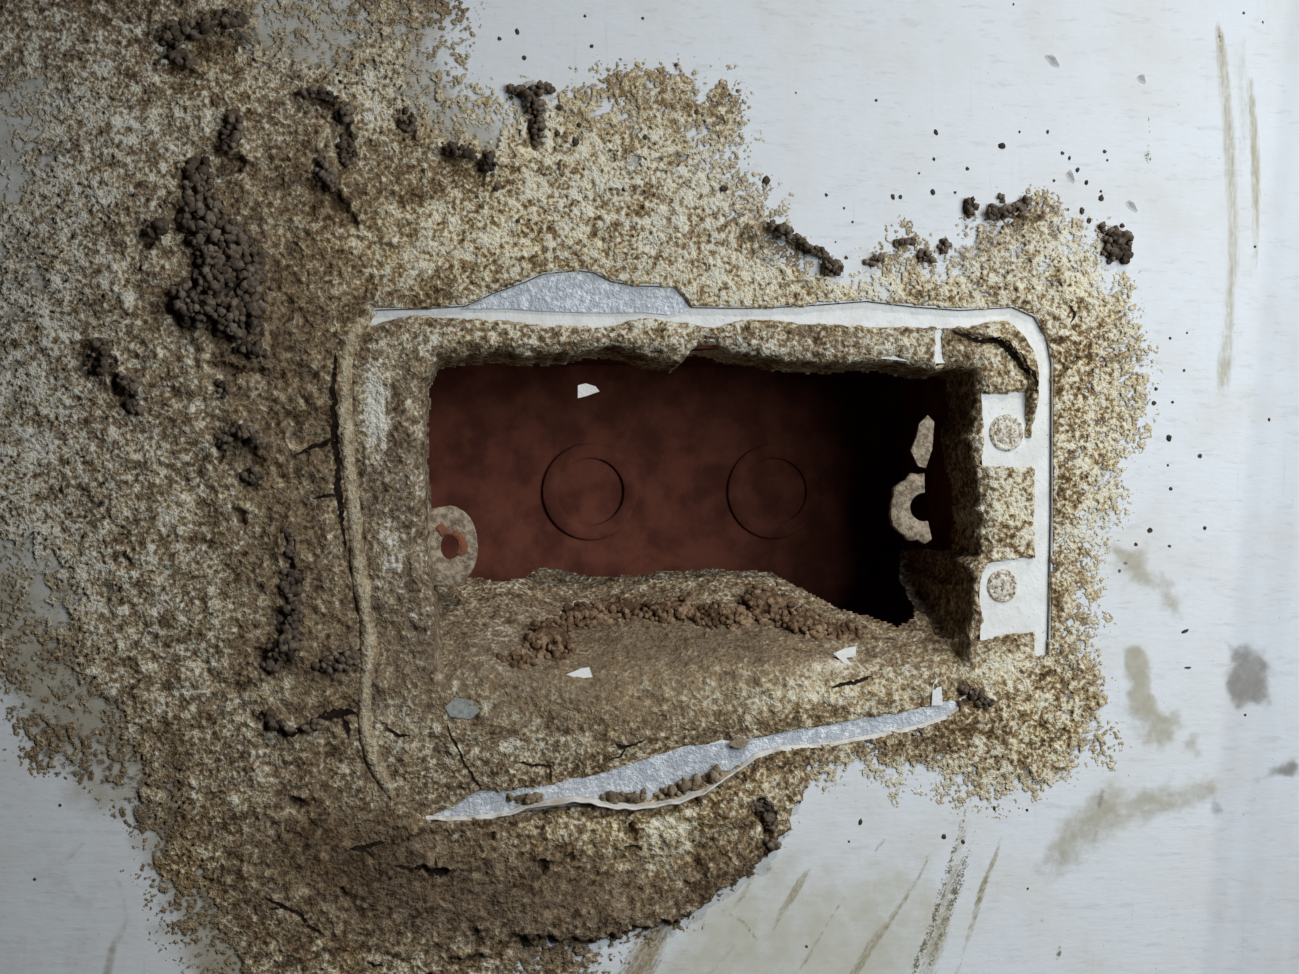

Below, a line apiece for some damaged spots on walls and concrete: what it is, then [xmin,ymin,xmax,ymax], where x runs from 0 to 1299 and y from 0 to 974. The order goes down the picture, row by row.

peeling [578,383,599,398]
peeling [426,679,959,822]